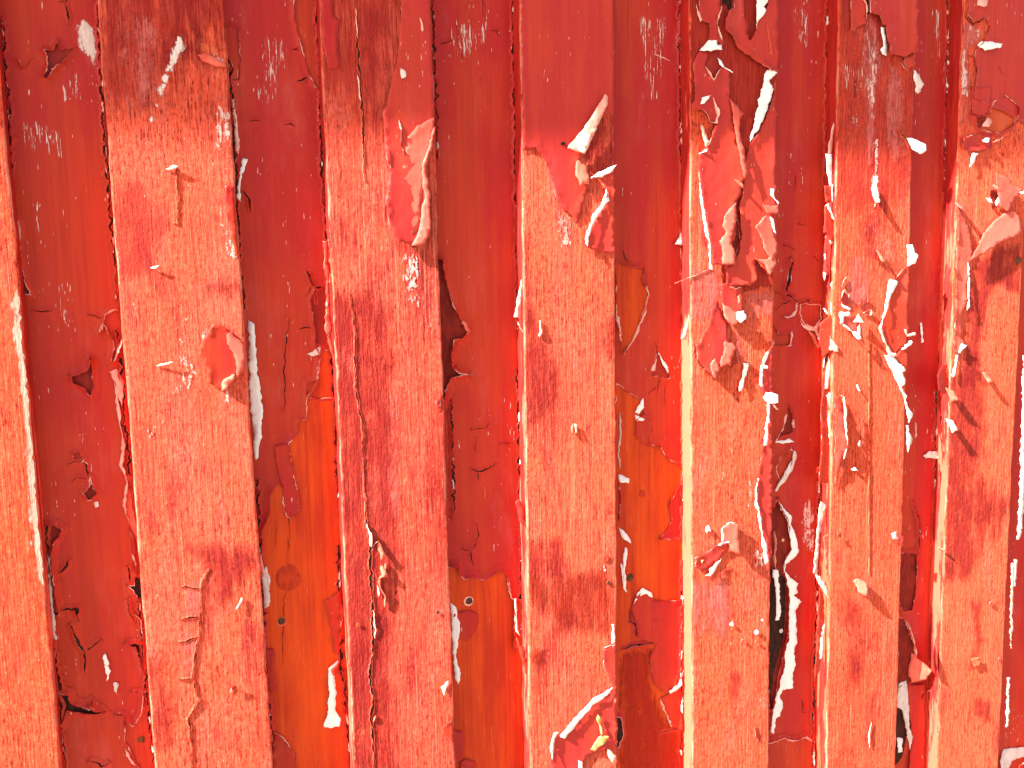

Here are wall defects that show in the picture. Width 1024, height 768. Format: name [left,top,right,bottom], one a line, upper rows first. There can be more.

peeling [37,35,80,86]
peeling [383,0,435,307]
peeling [521,0,652,360]
peeling [961,0,1024,167]
crack [43,520,112,768]
crack [178,568,210,768]
peeling [157,321,263,459]
peeling [258,239,348,768]
peeling [441,559,528,768]
peeling [550,379,685,768]
peeling [647,342,673,392]
peeling [681,0,926,768]